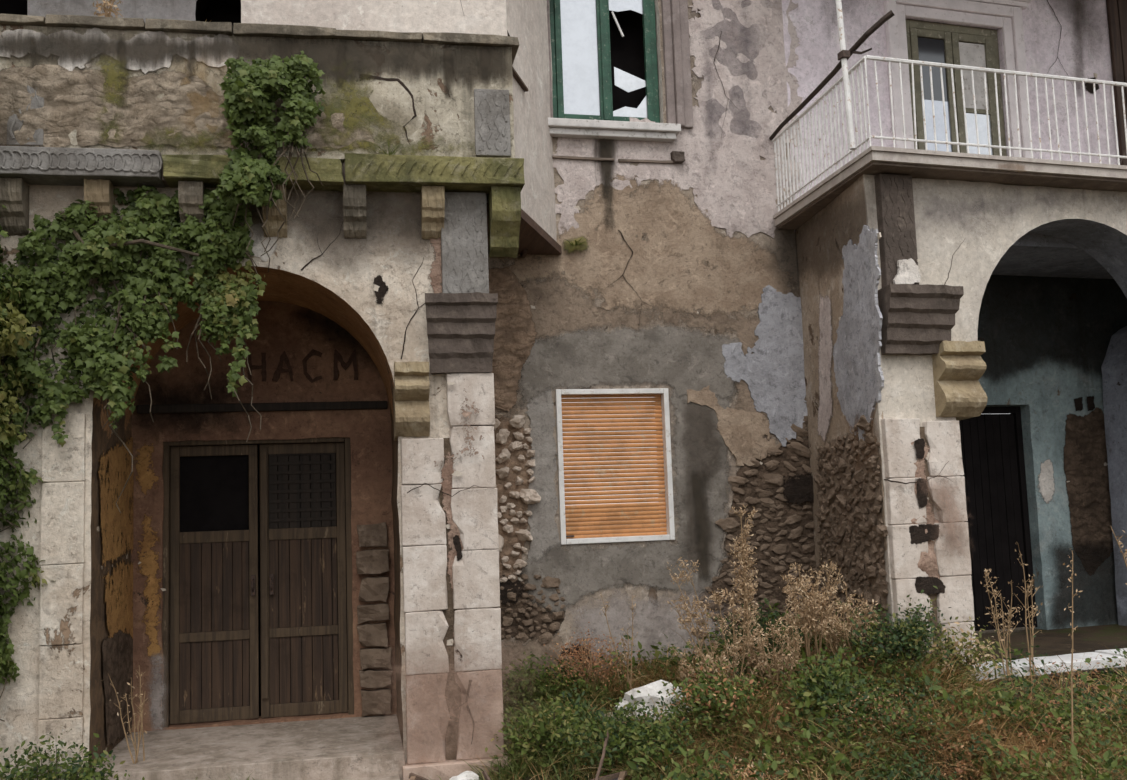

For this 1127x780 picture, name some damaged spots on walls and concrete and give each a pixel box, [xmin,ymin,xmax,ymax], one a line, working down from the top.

crack [347,74,417,144]
damp [595,139,615,224]
crack [1047,0,1074,87]
flaking render [427,238,442,293]
crack [609,230,654,323]
flaking render [434,174,795,691]
peeling [97,436,166,751]
flaking render [687,380,889,654]
spalling [905,438,946,595]
peeling [1038,396,1118,628]